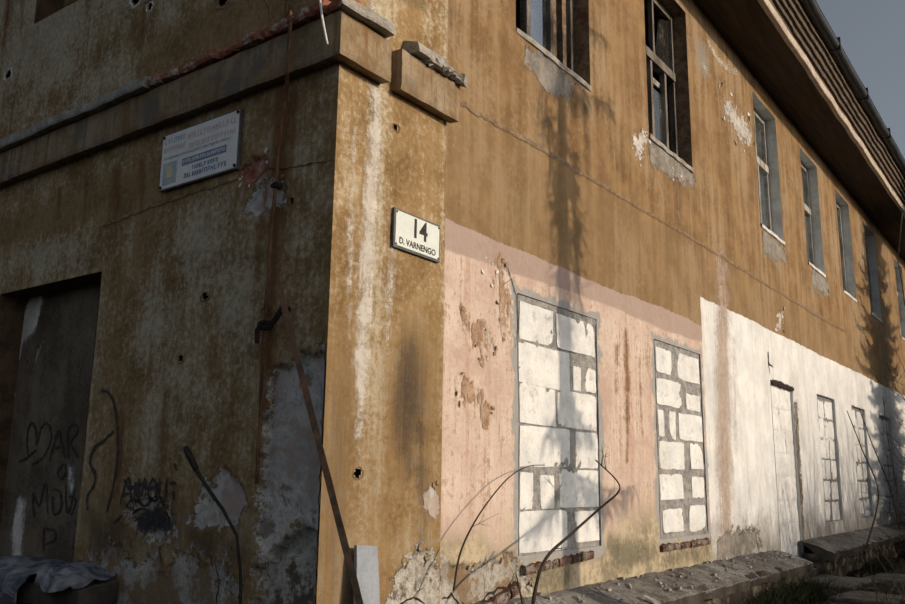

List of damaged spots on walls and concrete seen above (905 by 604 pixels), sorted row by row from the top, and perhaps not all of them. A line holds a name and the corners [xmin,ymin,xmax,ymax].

spalling [524,45,580,101]
peeling [719,81,755,153]
spalling [237,174,296,218]
water stain [349,87,381,411]
crack [460,101,845,332]
spalling [632,129,697,193]
peeling [454,372,495,430]
corrosion [615,329,642,434]
spalling [85,338,325,604]
spalling [386,539,594,604]